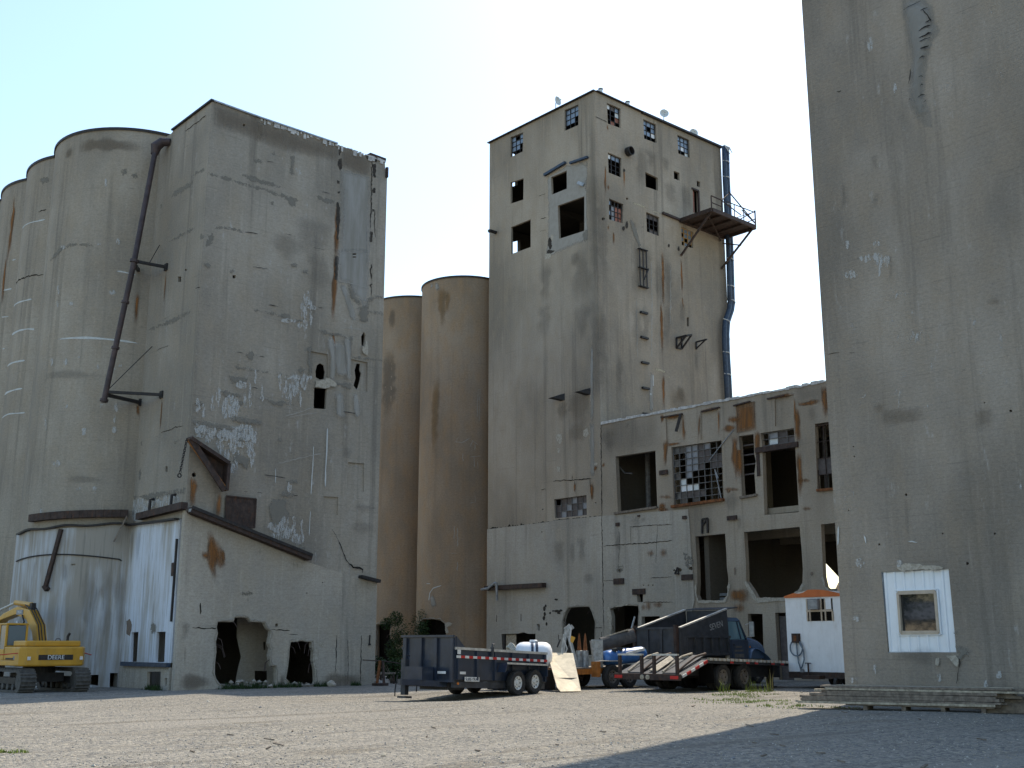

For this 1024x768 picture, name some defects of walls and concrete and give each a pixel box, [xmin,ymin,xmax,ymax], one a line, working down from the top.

corrosion [2,204,15,298]
spalling [193,351,278,470]
corrosion [661,415,685,462]
corrosion [698,404,760,472]
corrosion [203,538,225,575]
crack [333,531,363,573]
spalling [212,615,324,686]